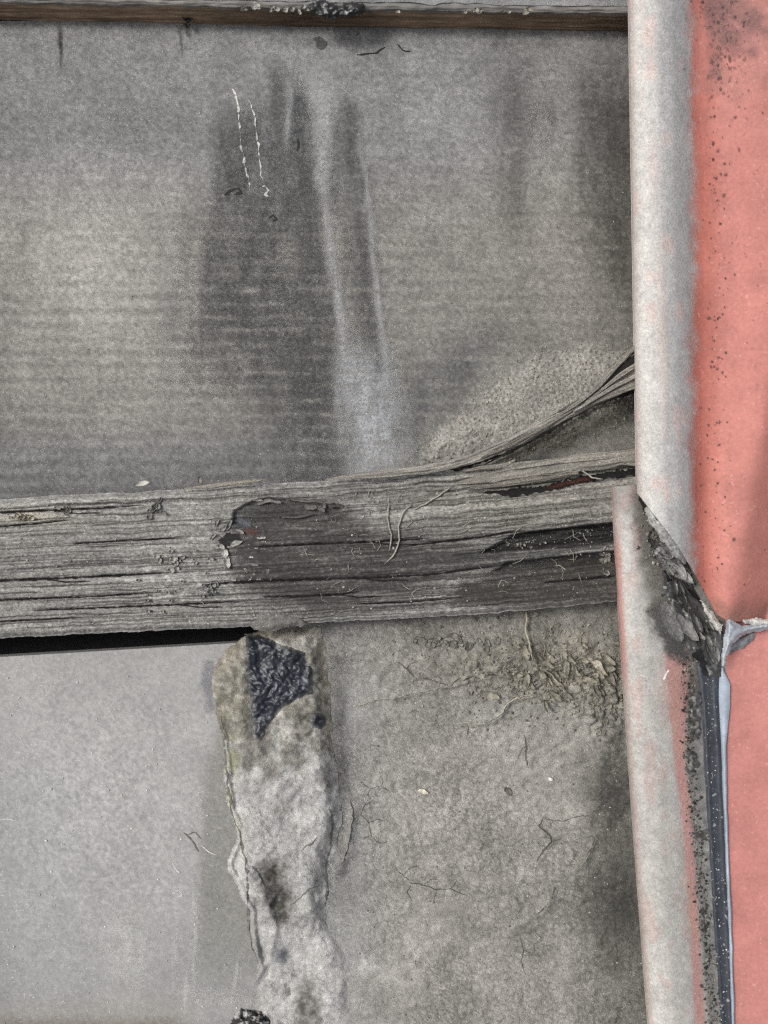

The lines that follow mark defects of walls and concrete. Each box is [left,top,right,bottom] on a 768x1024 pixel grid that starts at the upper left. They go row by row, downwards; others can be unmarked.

leakage [242,195,299,396]
leakage [356,378,389,459]
crack [398,633,498,687]
crack [361,782,388,843]
crack [537,815,595,860]
crack [396,865,467,901]